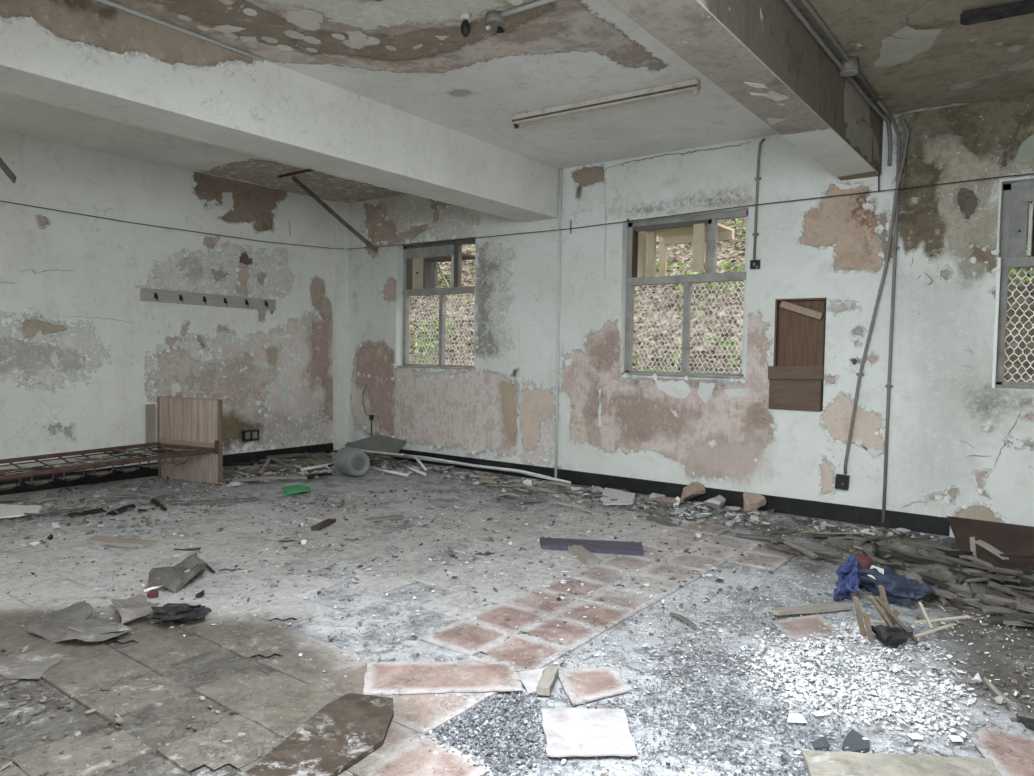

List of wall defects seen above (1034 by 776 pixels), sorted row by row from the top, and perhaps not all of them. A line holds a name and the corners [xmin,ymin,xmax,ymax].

peeling [0,0,668,73]
peeling [607,0,830,135]
leakage [706,0,1034,278]
peeling [190,172,288,233]
peeling [797,177,894,273]
peeling [0,308,111,393]
peeling [134,236,333,455]
leakage [474,249,498,355]
peeling [350,194,775,482]
peeling [820,374,890,459]
peeling [819,454,836,495]